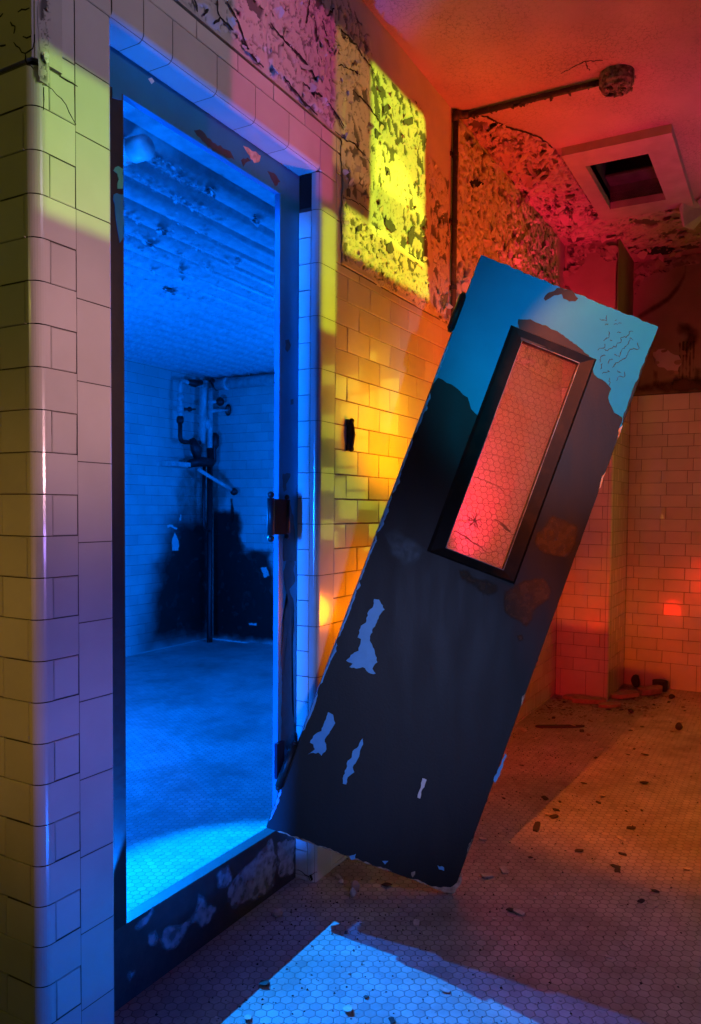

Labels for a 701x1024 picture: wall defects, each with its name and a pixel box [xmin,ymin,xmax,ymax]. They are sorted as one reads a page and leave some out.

crack [0,8,78,124]
peeling [183,0,701,325]